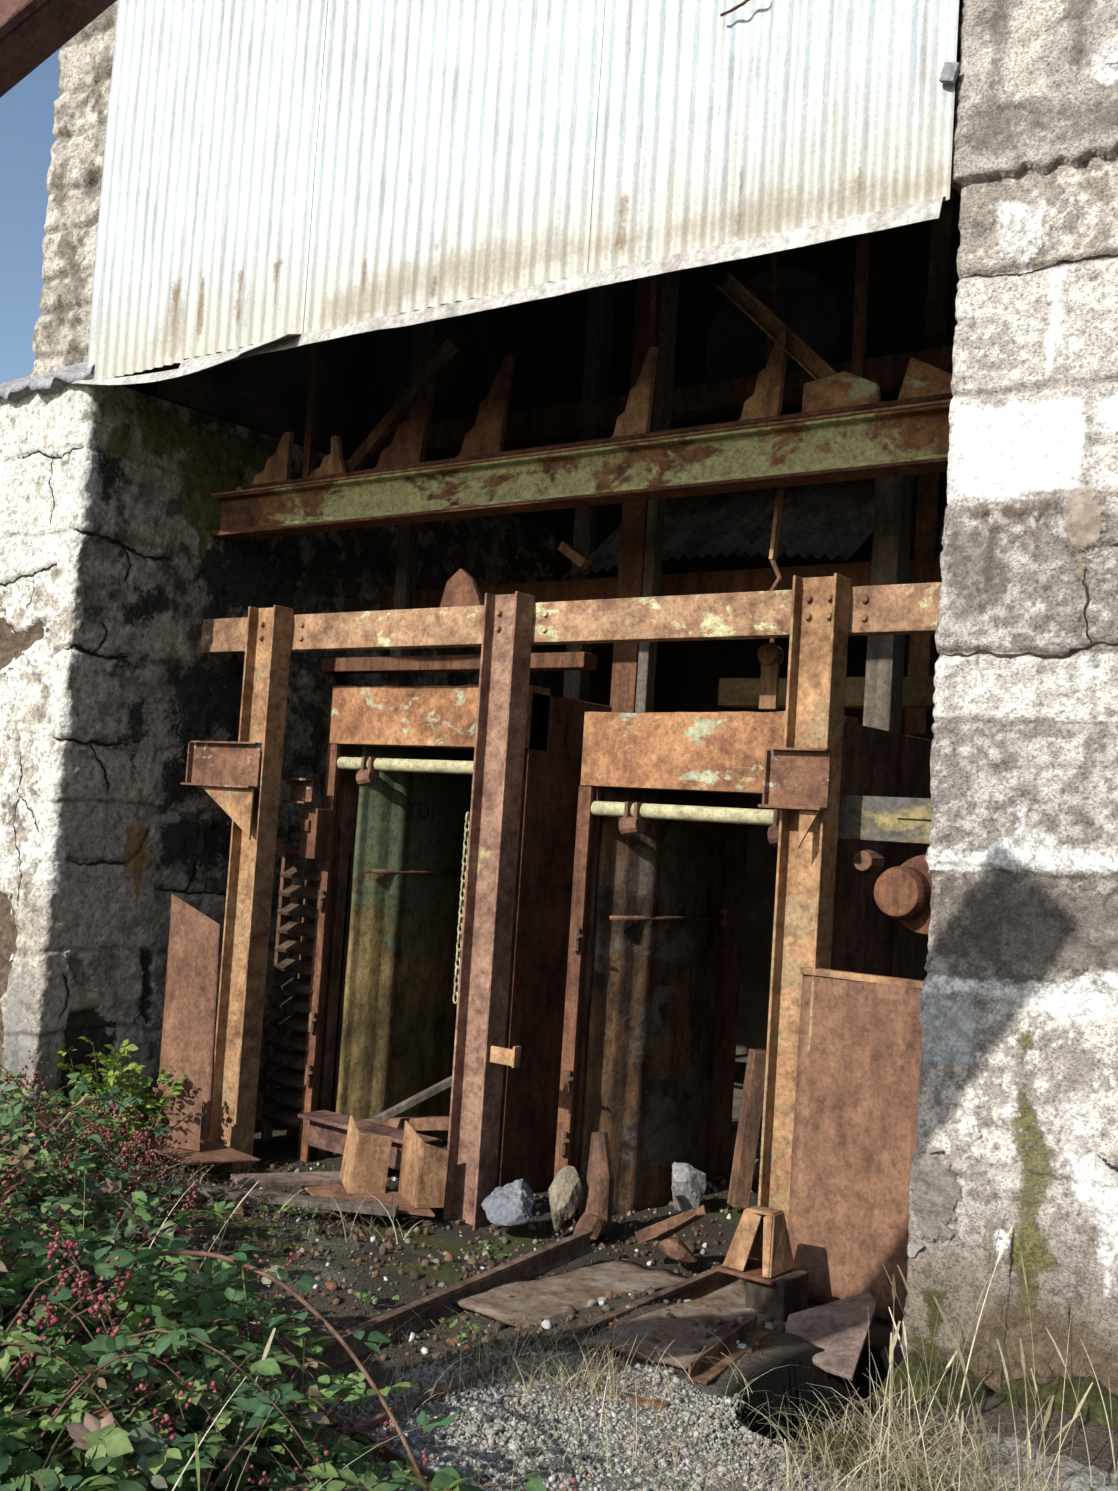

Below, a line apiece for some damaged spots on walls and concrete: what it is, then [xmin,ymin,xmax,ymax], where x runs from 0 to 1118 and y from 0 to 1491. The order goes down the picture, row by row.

peeling [0,607,49,674]
crack [0,564,57,608]
crack [18,446,172,581]
crack [64,621,128,660]
water stain [92,446,127,506]
water stain [193,527,307,619]
crack [943,560,1118,659]
water stain [111,578,244,892]
crack [13,737,116,911]
spalling [0,891,18,1081]
water stain [1060,1089,1118,1294]
water stain [955,1236,1118,1395]